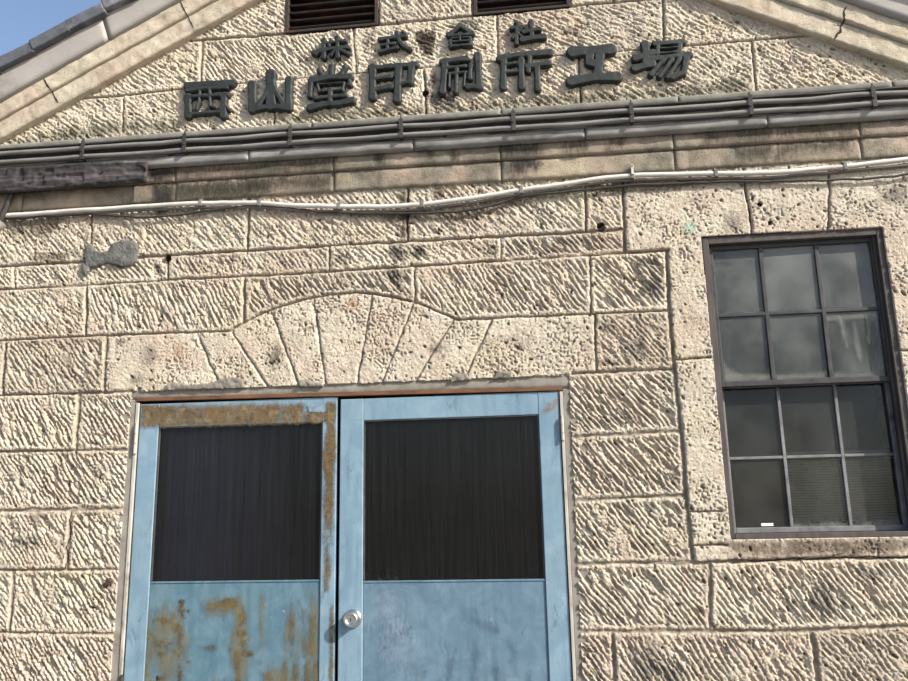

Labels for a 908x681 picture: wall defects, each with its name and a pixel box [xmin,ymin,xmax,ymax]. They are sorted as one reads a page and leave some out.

crack [833,6,862,40]
rust [140,402,337,590]
rust [144,600,189,681]
rust [209,599,254,681]
rust [266,606,334,681]